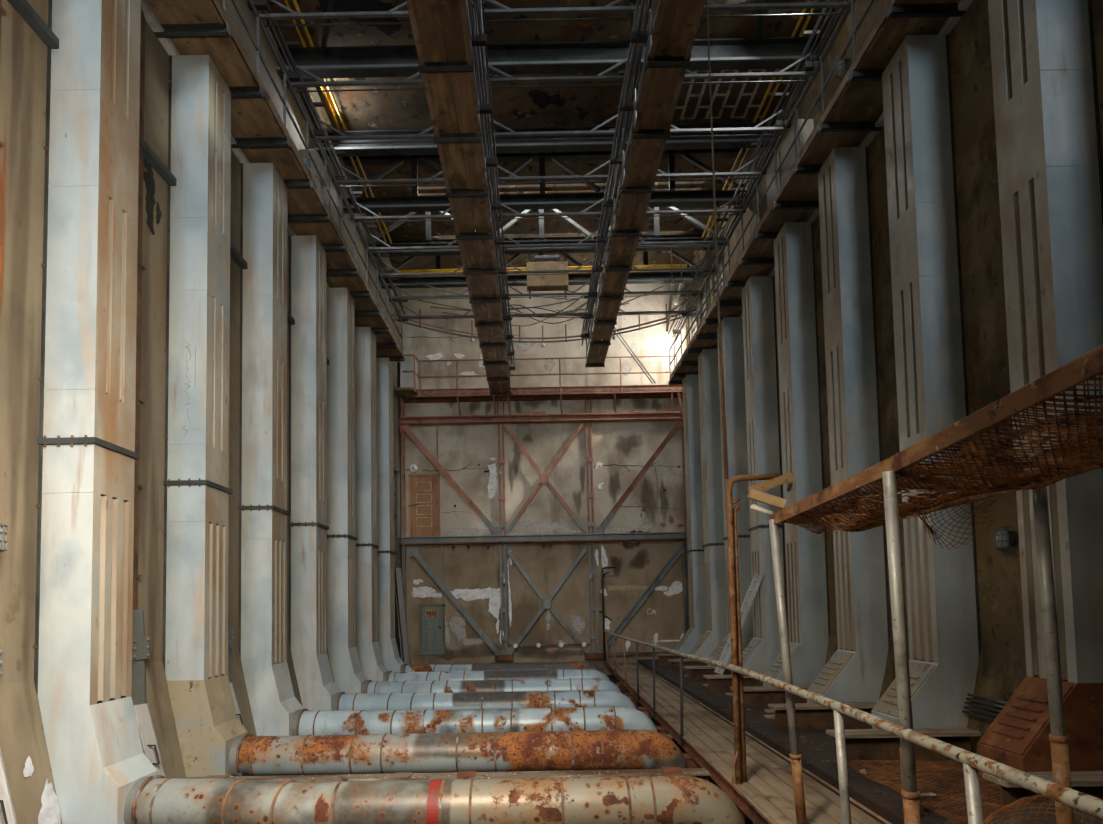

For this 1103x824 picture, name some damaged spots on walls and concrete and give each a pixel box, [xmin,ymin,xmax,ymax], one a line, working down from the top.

peeling [487,458,502,499]
water stain [610,477,618,496]
water stain [610,484,668,532]
peeling [595,546,608,571]
peeling [412,550,512,645]
peeling [600,581,683,596]
peeling [23,756,34,777]
peeling [38,778,61,824]